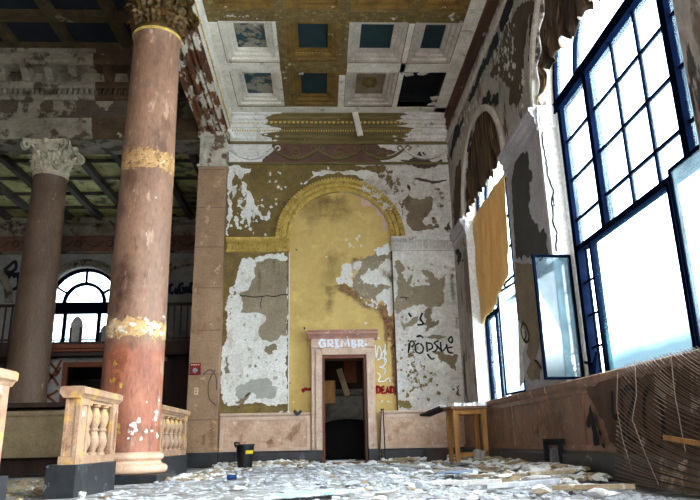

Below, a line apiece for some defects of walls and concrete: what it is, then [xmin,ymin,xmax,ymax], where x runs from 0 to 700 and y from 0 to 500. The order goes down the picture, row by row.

flaking render [0,100,28,114]
flaking render [60,100,128,118]
peeling [207,0,535,236]
flaking render [511,152,549,387]
crack [240,294,287,309]
peeling [104,315,166,345]
peeling [220,253,294,413]
flaking render [336,243,447,409]
flaking render [434,351,458,371]
peeling [127,410,158,441]